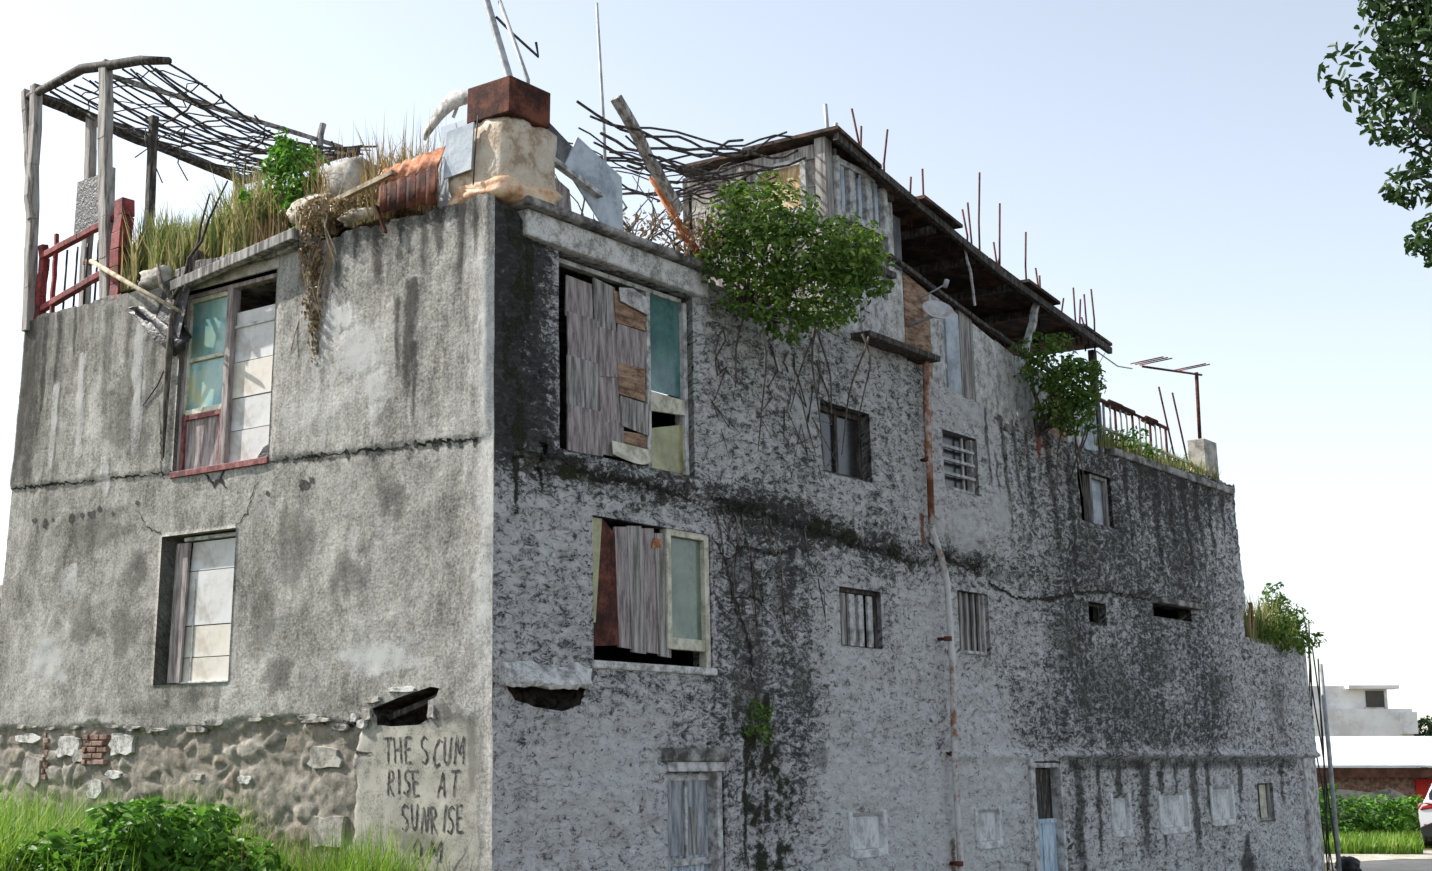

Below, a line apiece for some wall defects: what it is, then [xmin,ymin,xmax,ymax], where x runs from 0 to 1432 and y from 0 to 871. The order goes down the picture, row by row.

damp [300,195,478,416]
crack [10,402,482,526]
damp [984,409,1078,573]
damp [1122,458,1230,566]
spalling [0,686,439,871]